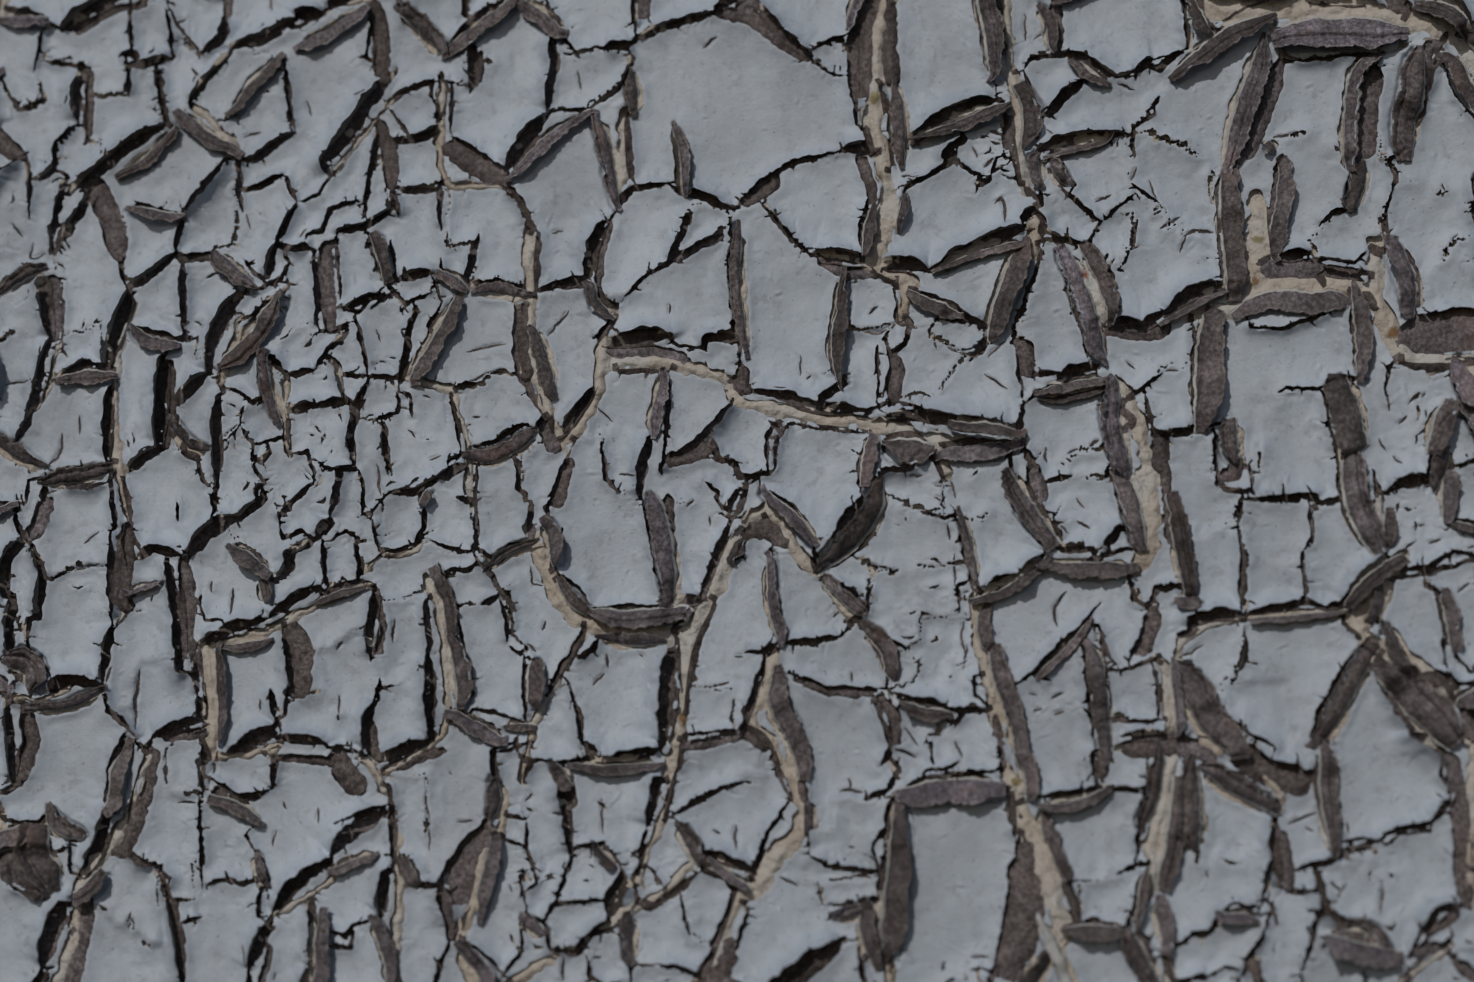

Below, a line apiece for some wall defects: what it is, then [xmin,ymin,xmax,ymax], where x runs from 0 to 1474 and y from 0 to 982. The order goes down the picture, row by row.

crack [1011,0,1221,119]
crack [1235,45,1474,385]
crack [1308,0,1474,127]
peeling [0,0,745,982]
crack [0,0,1160,982]
peeling [327,0,1474,982]
crack [1102,176,1367,738]
crack [1005,574,1474,982]
crack [1372,352,1474,499]
crack [1373,518,1474,744]